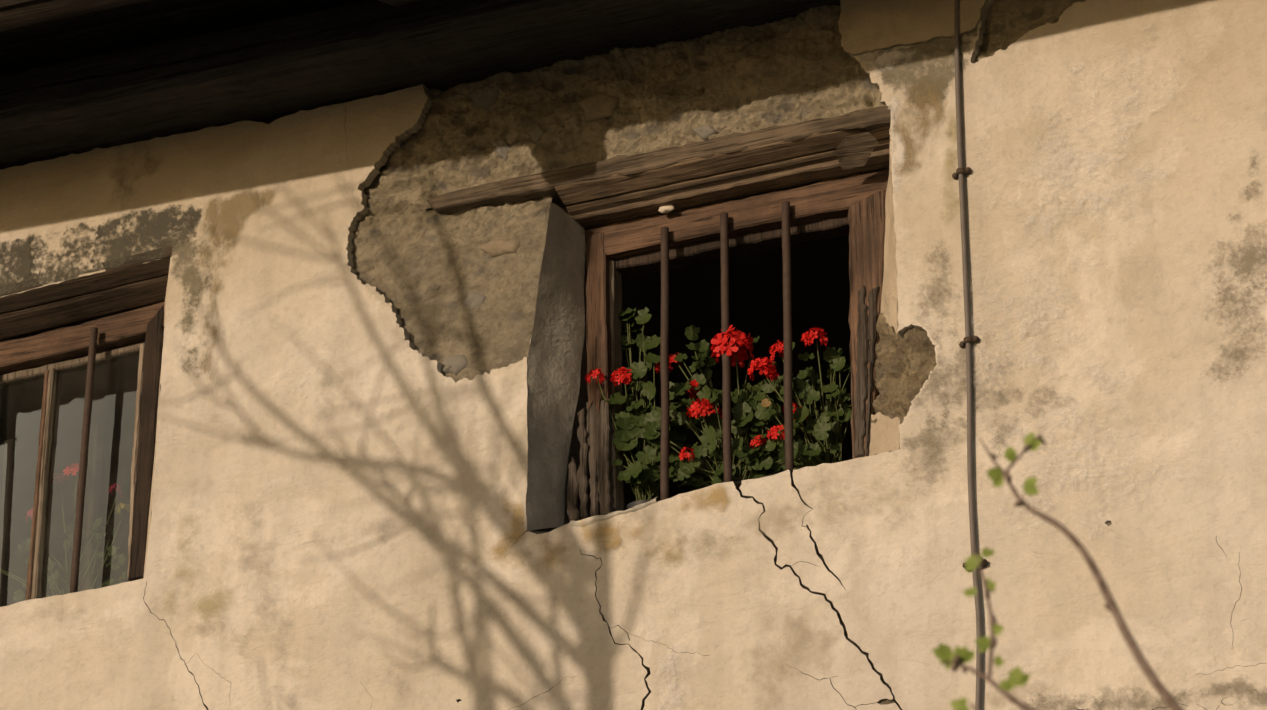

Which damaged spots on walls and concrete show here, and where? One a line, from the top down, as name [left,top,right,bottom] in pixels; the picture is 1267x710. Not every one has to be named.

water stain [861,29,978,183]
spalling [974,0,1086,63]
water stain [0,191,273,331]
spalling [352,5,886,382]
water stain [1232,245,1267,274]
spalling [870,313,937,424]
crack [580,550,710,710]
crack [733,468,902,710]